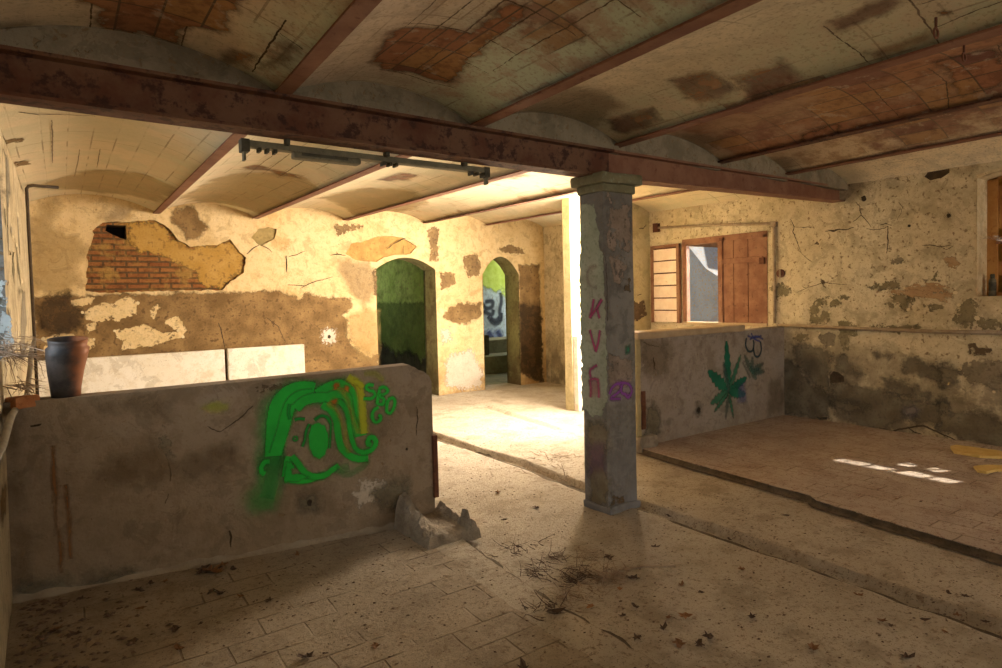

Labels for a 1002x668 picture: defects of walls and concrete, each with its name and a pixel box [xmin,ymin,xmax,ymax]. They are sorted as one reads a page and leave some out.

peeling [77,0,243,44]
peeling [370,2,526,83]
crack [393,0,641,73]
peeling [0,138,31,362]
spalling [71,220,246,351]
water stain [34,290,426,380]
water stain [440,301,483,391]
water stain [784,342,1002,447]